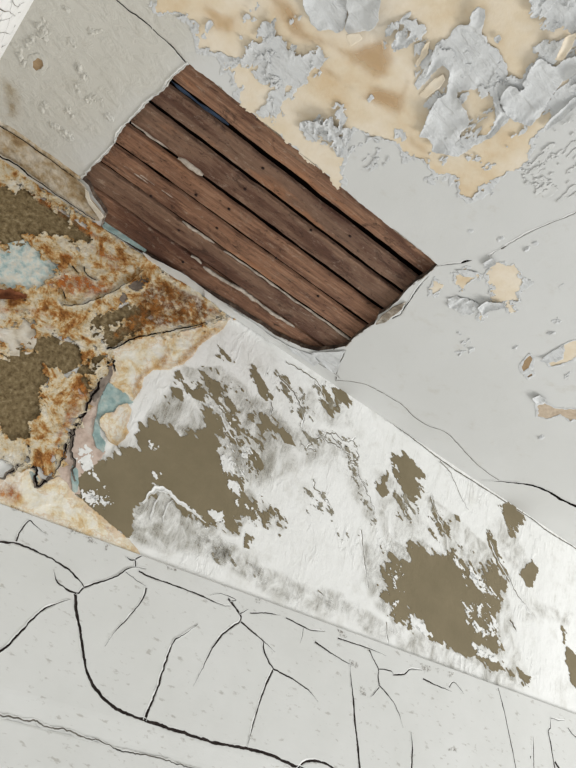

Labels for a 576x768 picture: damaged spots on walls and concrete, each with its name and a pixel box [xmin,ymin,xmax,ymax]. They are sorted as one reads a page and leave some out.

peeling [148,0,576,204]
corrosion [49,267,109,294]
corrosion [127,275,217,331]
peeling [0,62,406,554]
peeling [447,258,534,323]
crack [0,315,223,489]
peeling [518,339,576,380]
peeling [532,395,576,422]
crack [277,351,576,588]
crack [490,540,533,633]
crack [0,519,464,768]
crack [497,688,576,768]